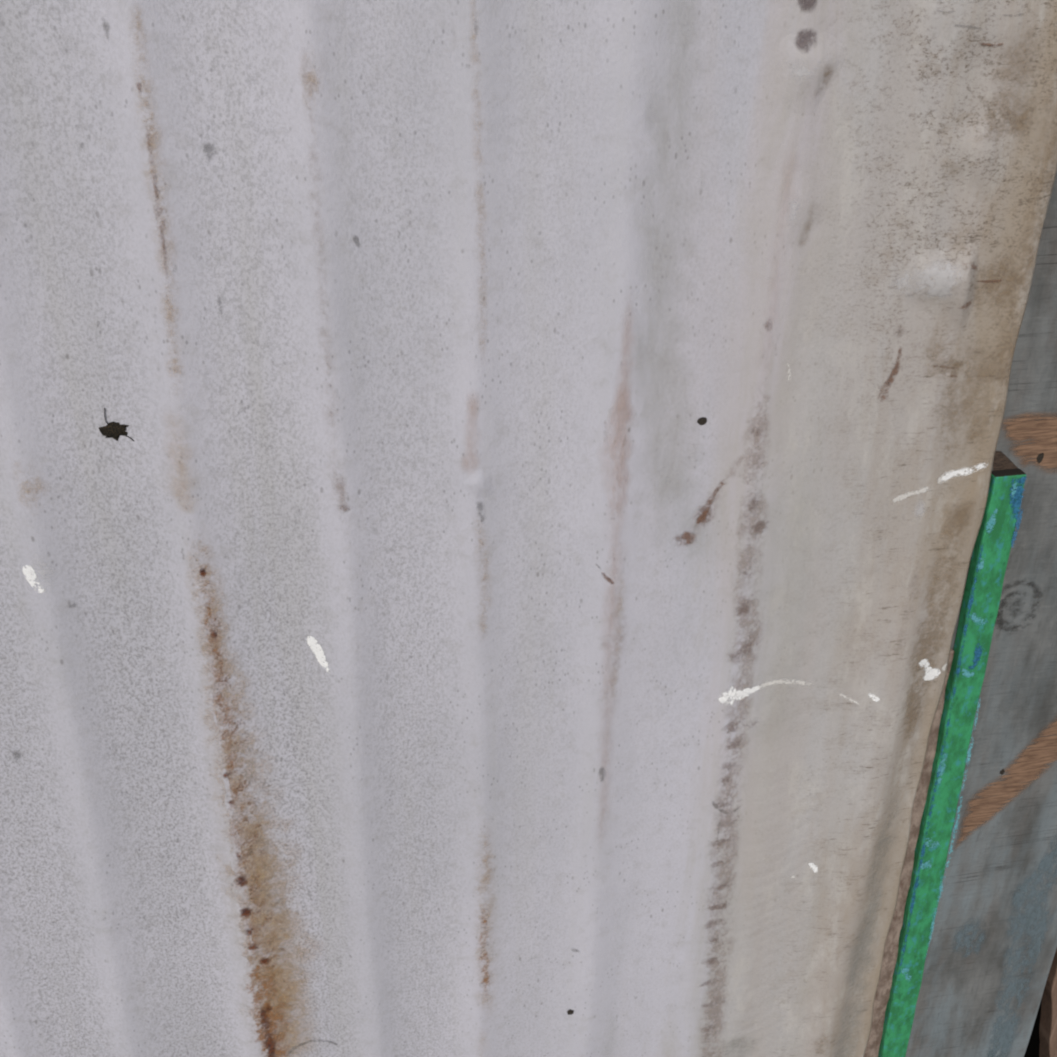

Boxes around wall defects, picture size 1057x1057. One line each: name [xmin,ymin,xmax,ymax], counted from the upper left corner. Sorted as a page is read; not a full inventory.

rust [679,482,723,544]
rust [224,756,291,1057]